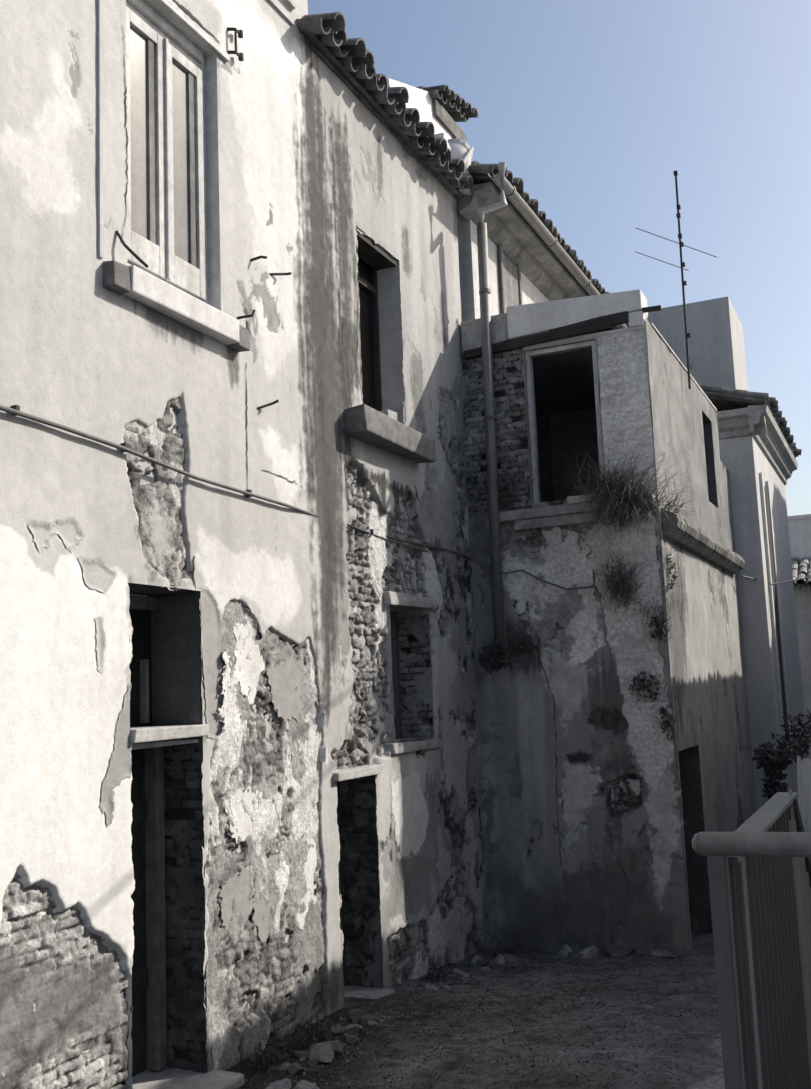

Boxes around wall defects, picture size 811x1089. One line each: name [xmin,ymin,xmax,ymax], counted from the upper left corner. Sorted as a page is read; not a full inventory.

peeling [28,517,116,594]
flaking render [123,397,189,588]
leakage [296,37,417,713]
flaking render [411,348,532,571]
flaking render [597,329,656,497]
peeling [99,684,131,826]
flaking render [197,459,446,1071]
flaking render [502,511,674,861]
flaking render [0,872,129,1089]
flaking render [386,810,483,987]